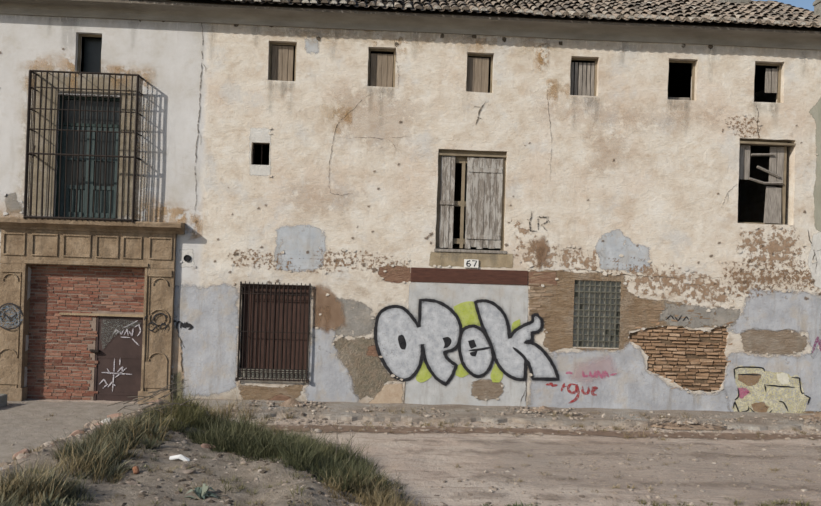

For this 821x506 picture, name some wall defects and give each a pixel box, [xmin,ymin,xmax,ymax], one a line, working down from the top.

crack [329,96,399,195]
peeling [1,193,23,215]
peeling [229,246,411,283]
spalling [425,221,821,401]
spalling [332,335,403,400]